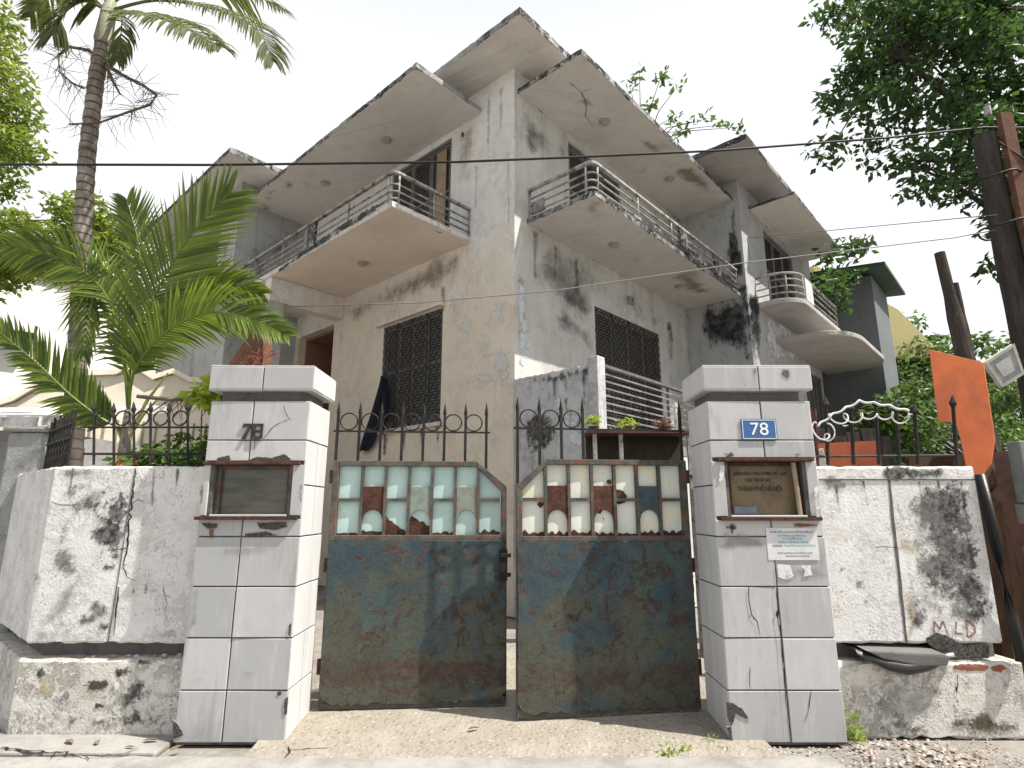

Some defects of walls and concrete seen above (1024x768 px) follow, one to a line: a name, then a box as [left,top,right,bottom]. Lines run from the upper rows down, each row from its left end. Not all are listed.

water stain [550,247,587,310]
water stain [702,214,761,372]
water stain [524,414,556,459]
water stain [66,468,132,569]
crack [113,469,143,635]
water stain [883,465,993,627]
water stain [100,658,156,727]
spalling [725,702,750,741]
crack [748,567,811,729]